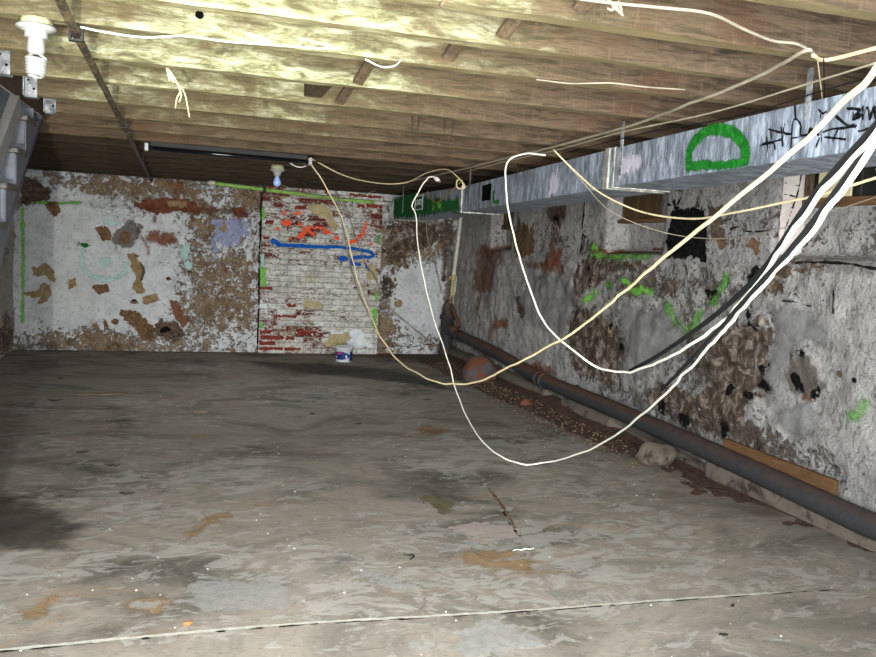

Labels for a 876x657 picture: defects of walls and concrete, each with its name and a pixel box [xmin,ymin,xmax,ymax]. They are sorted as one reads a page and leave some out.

flaking render [20,176,61,218]
flaking render [350,193,383,208]
flaking render [512,219,535,260]
flaking render [546,205,566,230]
flaking render [743,232,762,282]
flaking render [24,263,56,304]
flaking render [72,220,316,351]
flaking render [380,276,402,307]
flaking render [566,252,685,389]
flaking render [639,308,826,439]
crack [488,488,522,537]
crack [0,589,835,652]